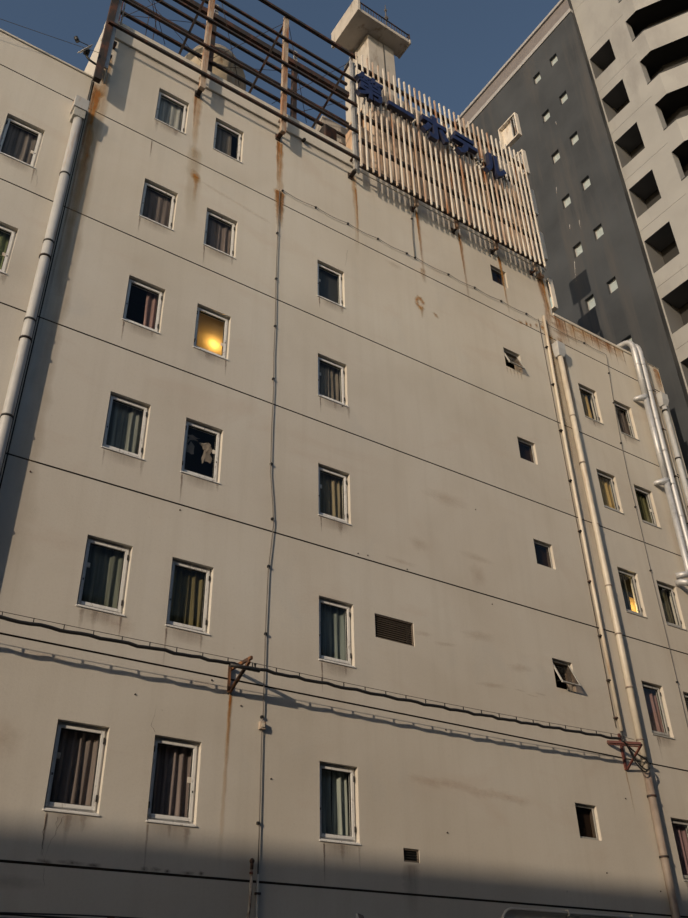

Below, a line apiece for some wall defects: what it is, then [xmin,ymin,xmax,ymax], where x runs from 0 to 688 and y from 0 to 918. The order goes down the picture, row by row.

corrosion [72,87,103,189]
corrosion [520,316,623,378]